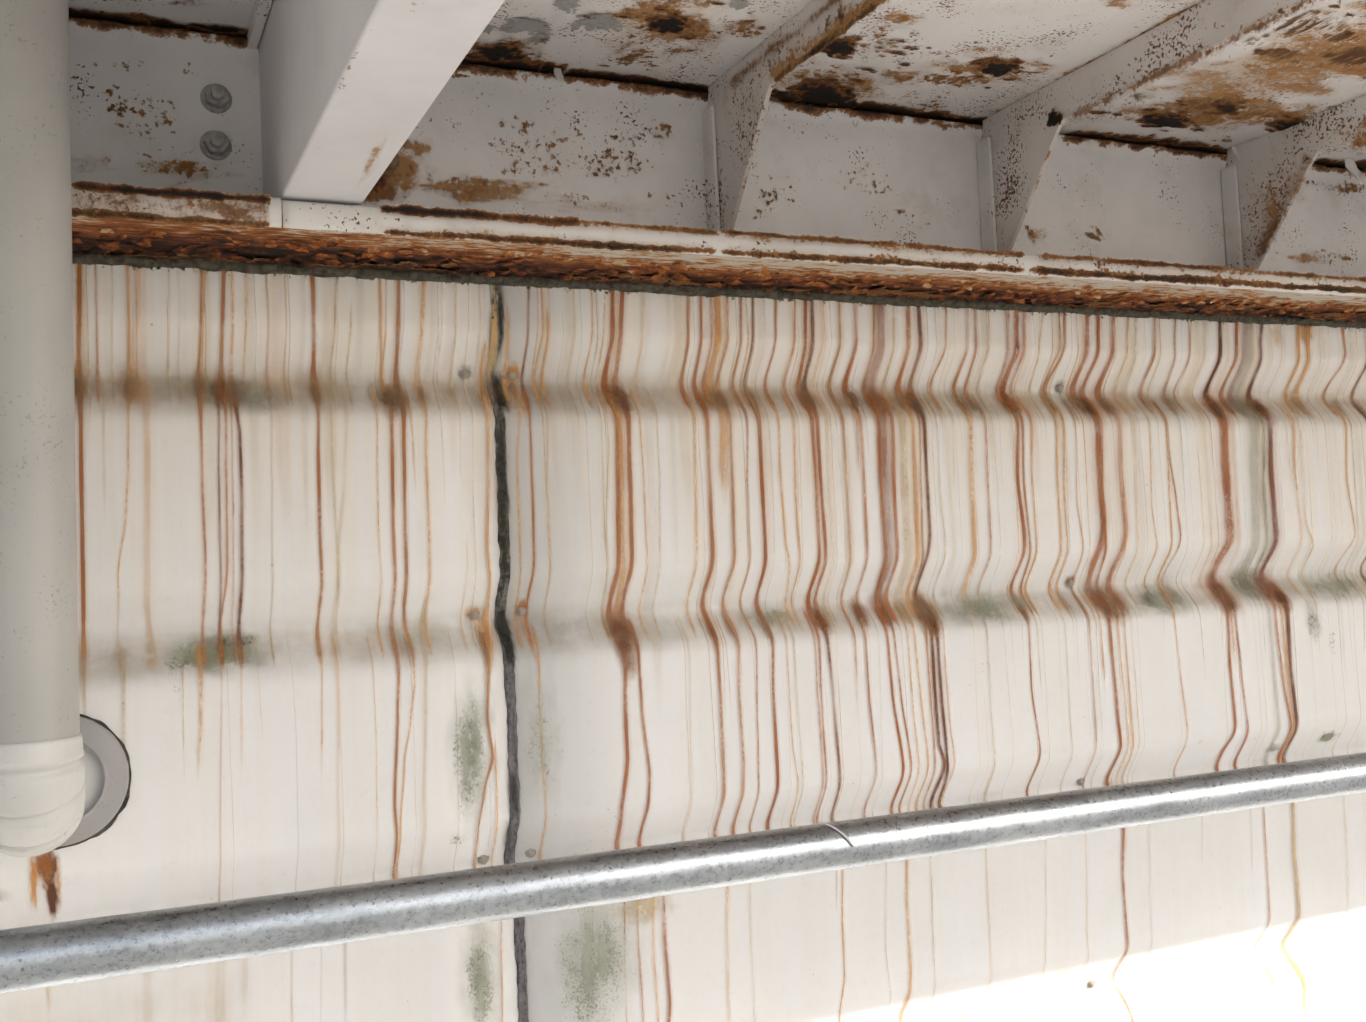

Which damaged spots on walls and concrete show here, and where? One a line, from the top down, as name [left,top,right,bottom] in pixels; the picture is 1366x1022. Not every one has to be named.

corrosion [1045,0,1366,143]
corrosion [74,263,99,666]
corrosion [183,269,247,684]
corrosion [310,276,323,657]
corrosion [374,278,430,879]
corrosion [451,316,549,868]
corrosion [583,290,651,850]
corrosion [680,296,841,837]
corrosion [1042,312,1191,786]
corrosion [1203,322,1298,772]
corrosion [30,851,60,915]
corrosion [624,896,671,1022]